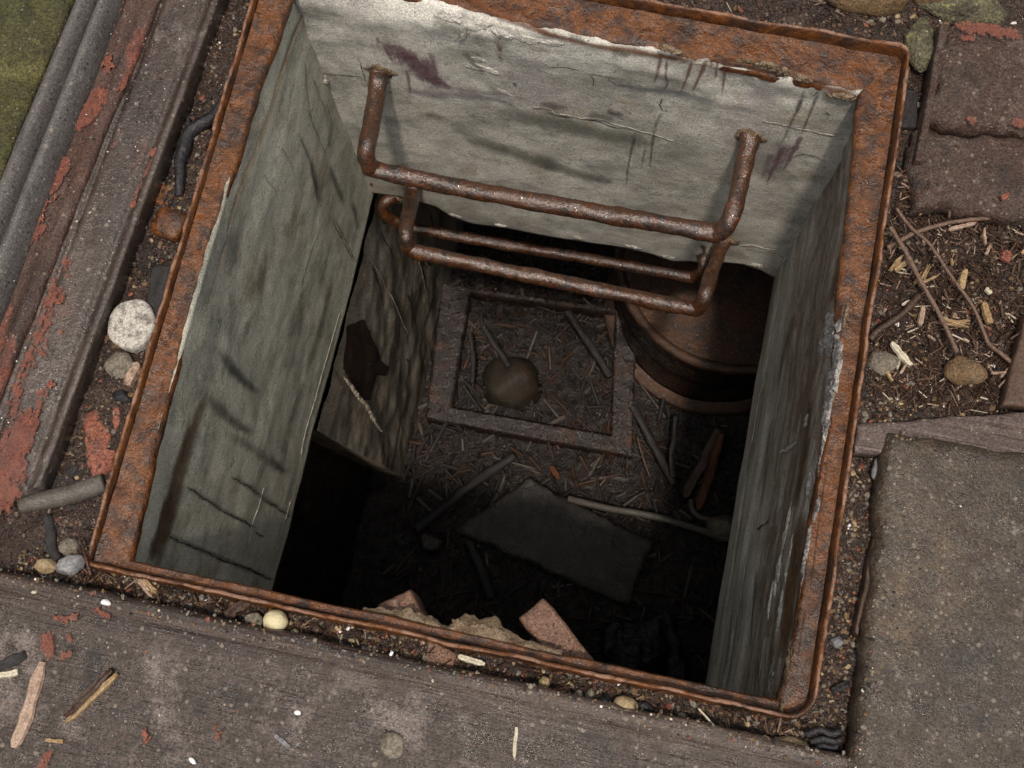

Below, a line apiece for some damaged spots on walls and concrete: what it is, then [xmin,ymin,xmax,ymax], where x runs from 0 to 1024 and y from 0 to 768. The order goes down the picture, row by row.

peeling [30,156,70,244]
peeling [75,53,128,132]
rust [383,43,451,91]
crack [549,67,629,87]
crack [533,107,673,141]
rust [471,0,737,88]
rust [765,137,802,181]
peeling [0,253,75,514]
spalling [344,319,389,400]
rust [152,404,203,556]
spalling [759,302,851,697]
rust [779,429,826,670]